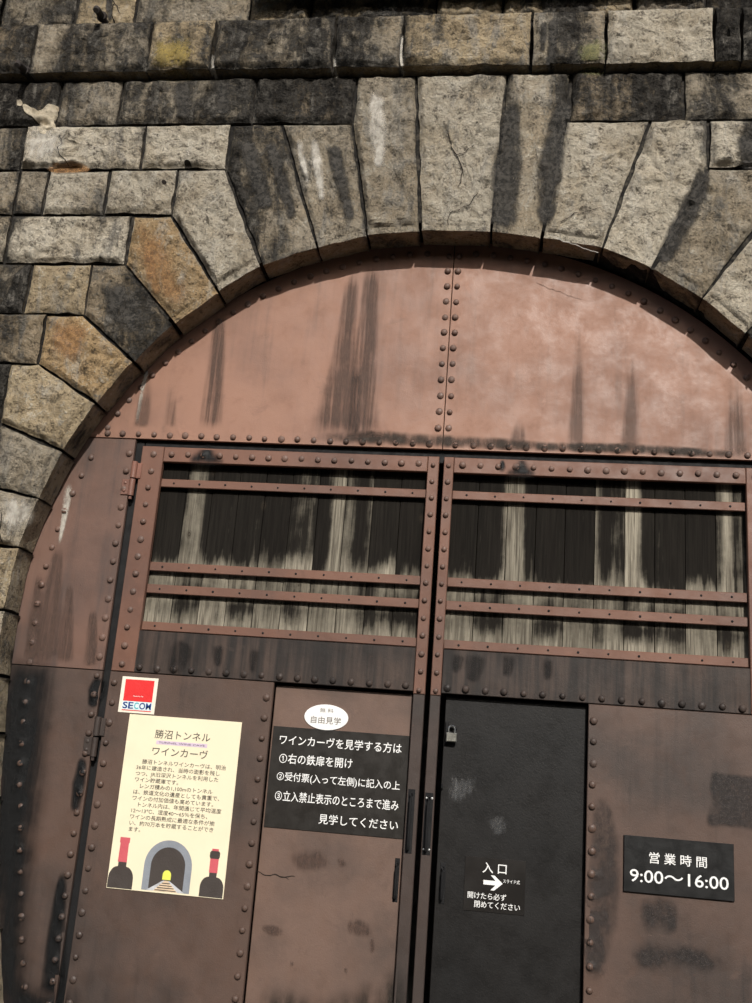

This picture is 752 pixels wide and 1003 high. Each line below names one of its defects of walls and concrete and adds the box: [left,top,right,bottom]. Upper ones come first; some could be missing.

crack [448,134,478,226]
leakage [491,102,522,226]
leakage [537,99,570,223]
leakage [658,170,710,262]
leakage [206,320,224,423]
leakage [321,275,377,431]